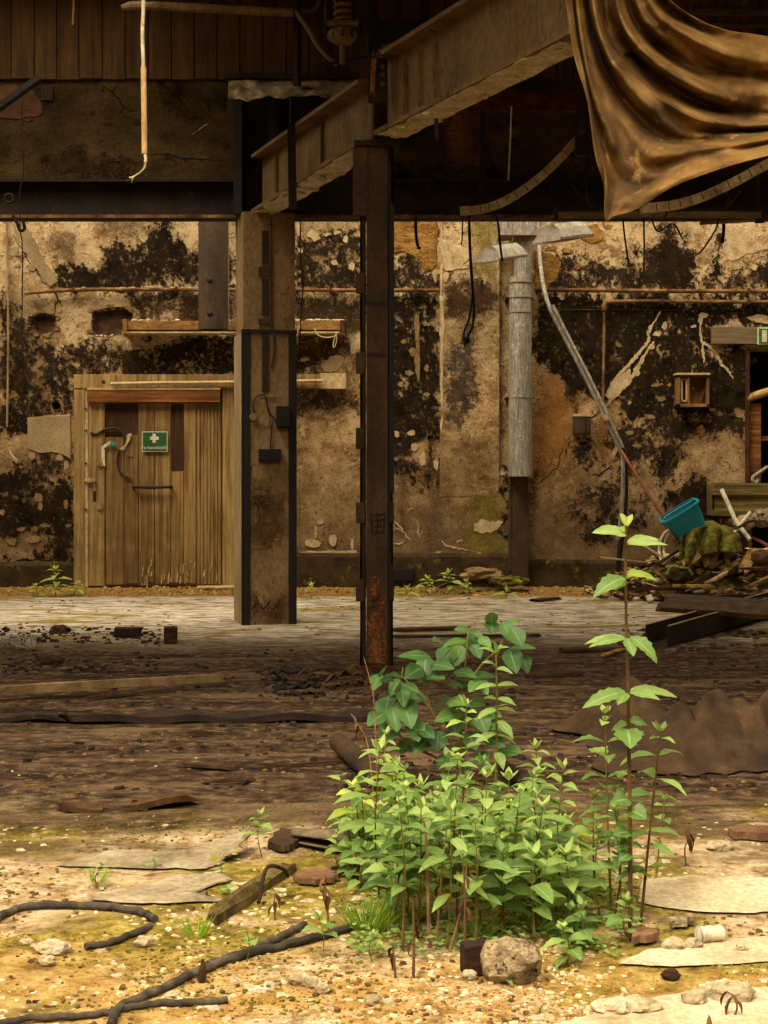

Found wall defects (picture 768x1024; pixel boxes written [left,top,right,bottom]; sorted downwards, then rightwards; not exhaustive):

flaking render [0,84,47,122]
water stain [50,222,198,302]
water stain [295,222,360,304]
water stain [0,290,234,444]
water stain [394,253,486,548]
flaking render [605,311,667,407]
water stain [532,222,768,550]
flaking render [690,312,733,379]
flaking render [747,314,768,324]
water stain [0,447,74,562]
rust [365,575,388,666]